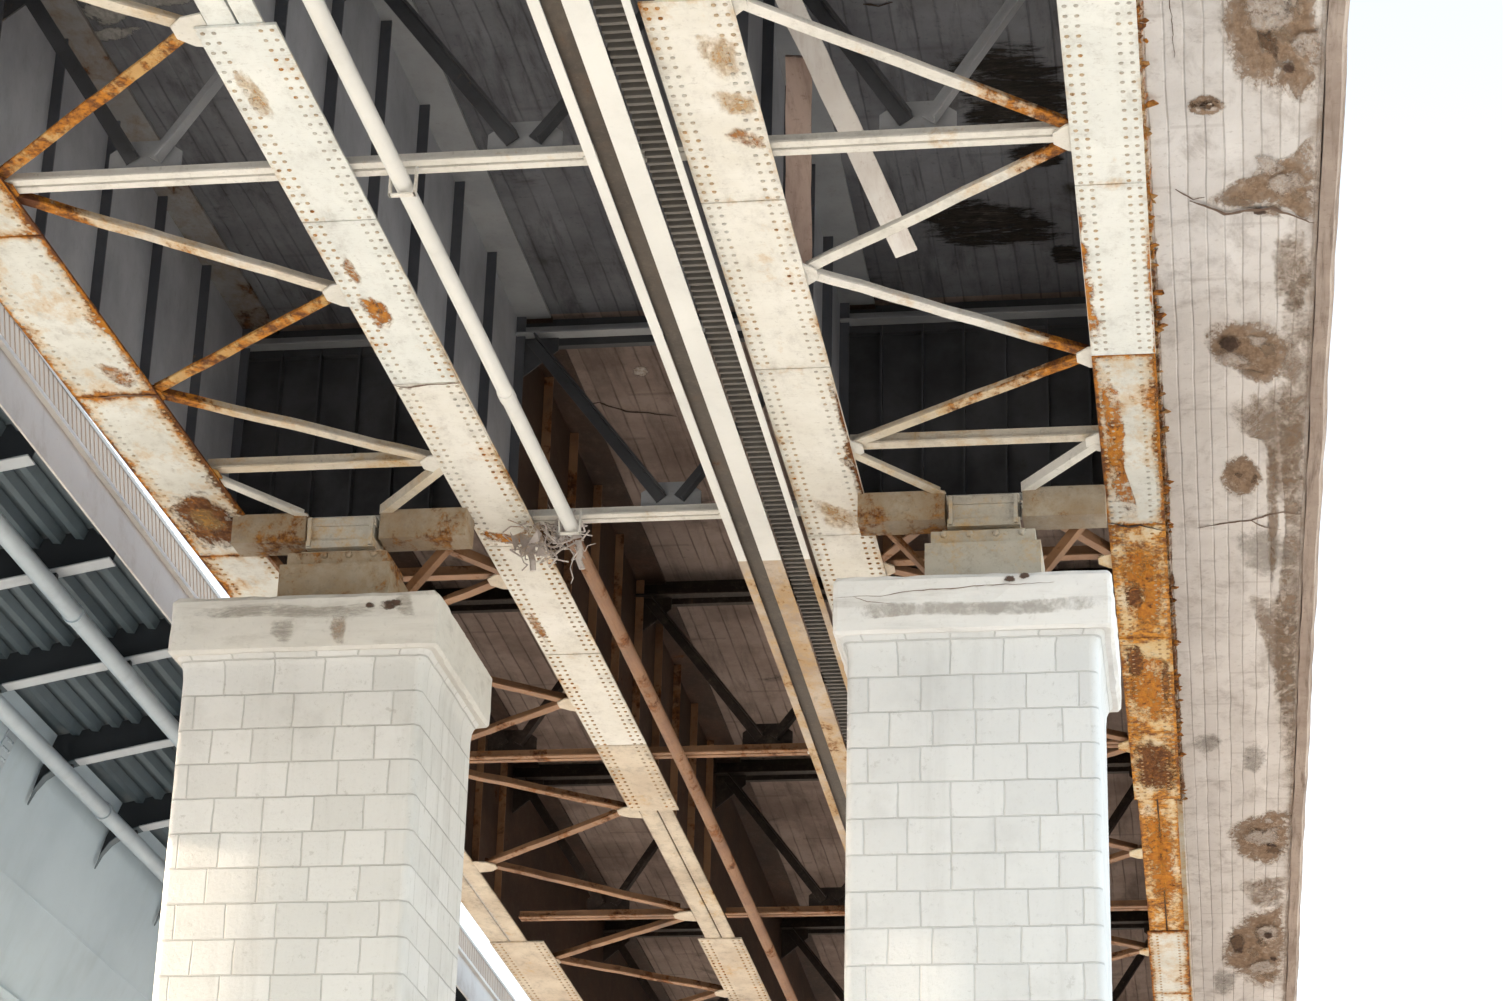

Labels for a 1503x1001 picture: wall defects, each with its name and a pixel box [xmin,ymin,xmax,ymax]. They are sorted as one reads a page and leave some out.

rust [702,39,733,71]
rust [723,96,762,146]
rust [344,260,392,328]
rust [1078,213,1103,337]
rust [164,410,244,548]
rust [1100,379,1136,510]
rust [1121,0,1188,802]
leakage [1237,328,1309,746]
rust [1145,808,1178,907]